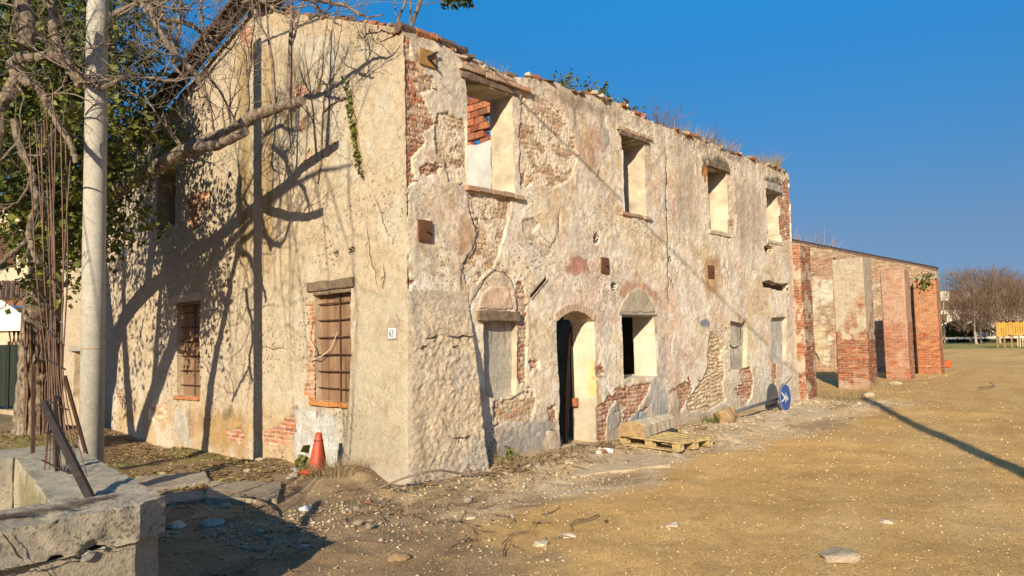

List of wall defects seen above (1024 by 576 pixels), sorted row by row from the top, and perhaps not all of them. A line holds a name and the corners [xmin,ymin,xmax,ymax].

spalling [403,38,511,283]
spalling [518,93,579,189]
crack [665,151,673,303]
spalling [264,412,296,451]
spalling [303,301,316,401]
spalling [492,281,556,427]
spalling [596,383,649,442]
spalling [669,332,755,412]